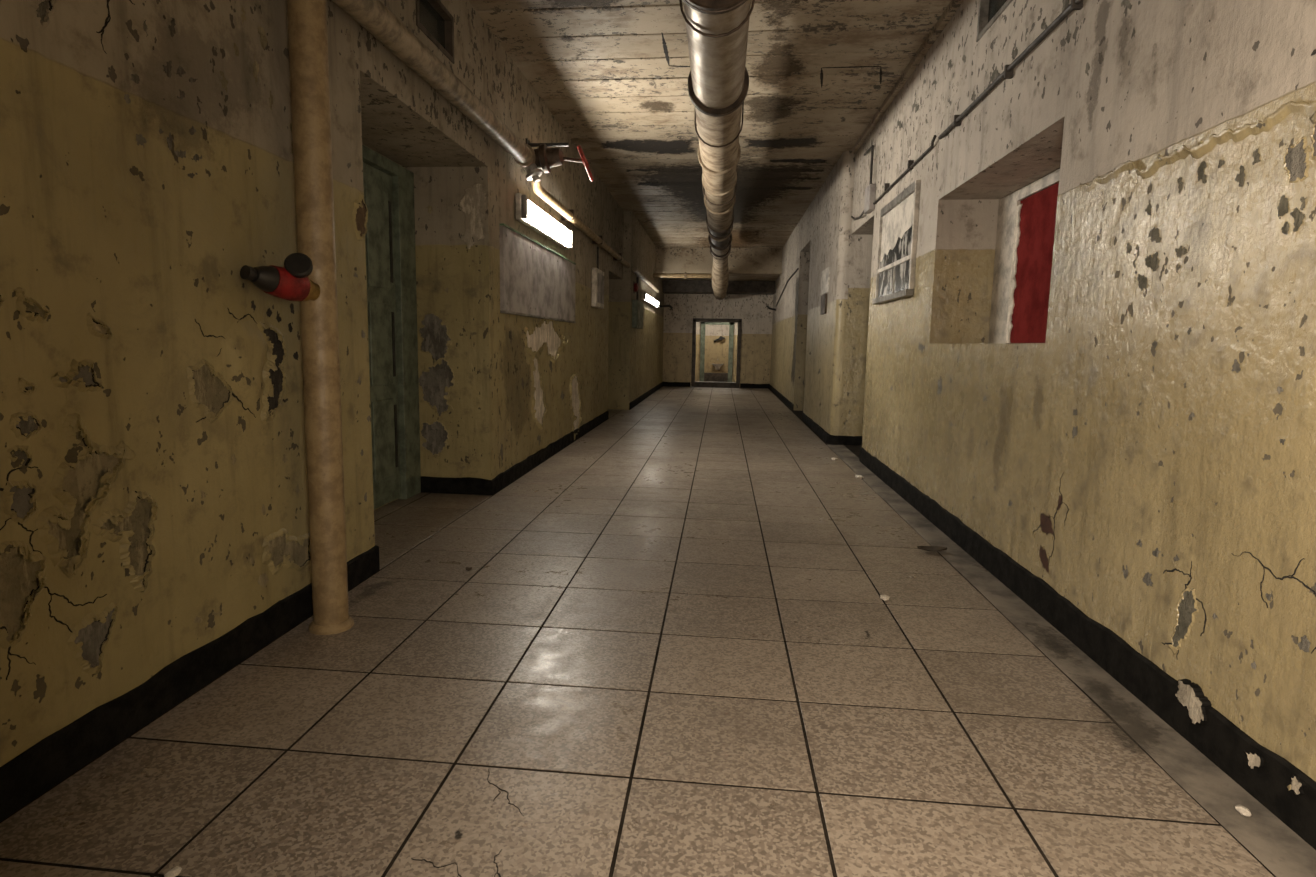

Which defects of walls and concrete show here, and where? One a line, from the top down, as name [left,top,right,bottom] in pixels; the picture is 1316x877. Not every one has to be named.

peeling [1078,100,1316,235]
peeling [1126,200,1161,291]
peeling [51,359,104,392]
peeling [509,319,582,445]
peeling [0,412,158,649]
peeling [1123,565,1153,587]
crack [1233,552,1316,608]
peeling [67,602,118,676]
flaking render [1168,588,1218,654]
flaking render [1175,679,1212,725]
crack [487,769,524,816]
crack [411,858,462,877]